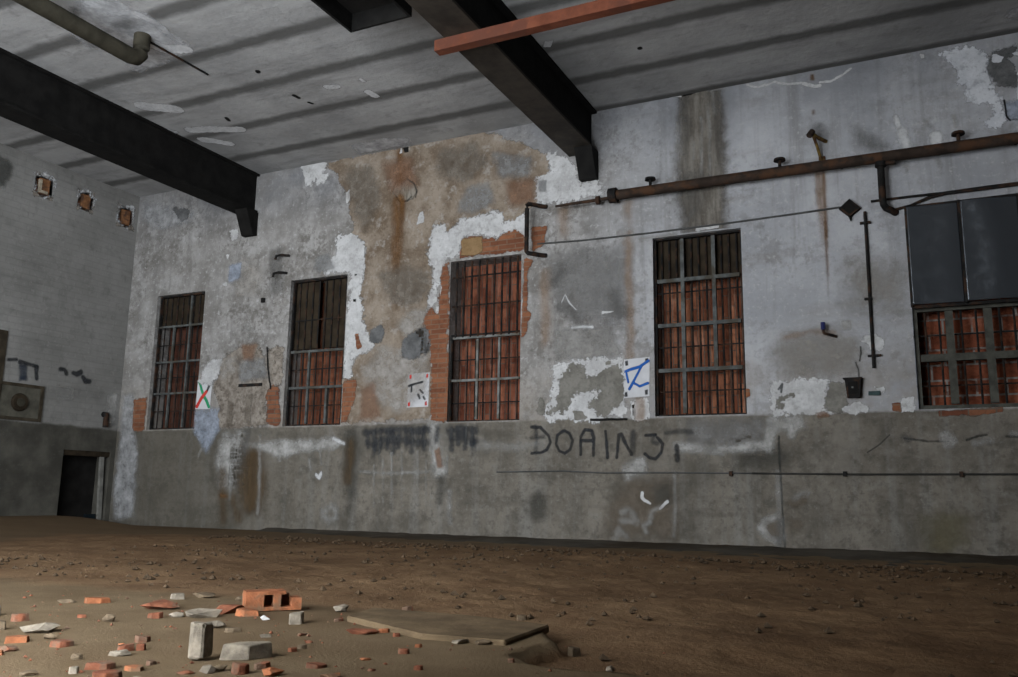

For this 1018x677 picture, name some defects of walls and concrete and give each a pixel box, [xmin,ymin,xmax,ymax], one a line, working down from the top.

peeling [938,45,1018,130]
spalling [33,171,57,201]
spalling [76,188,97,214]
corrosion [393,194,403,262]
damp [677,89,726,232]
flaking render [301,132,550,475]
peeling [537,325,627,425]
peeling [769,375,869,417]